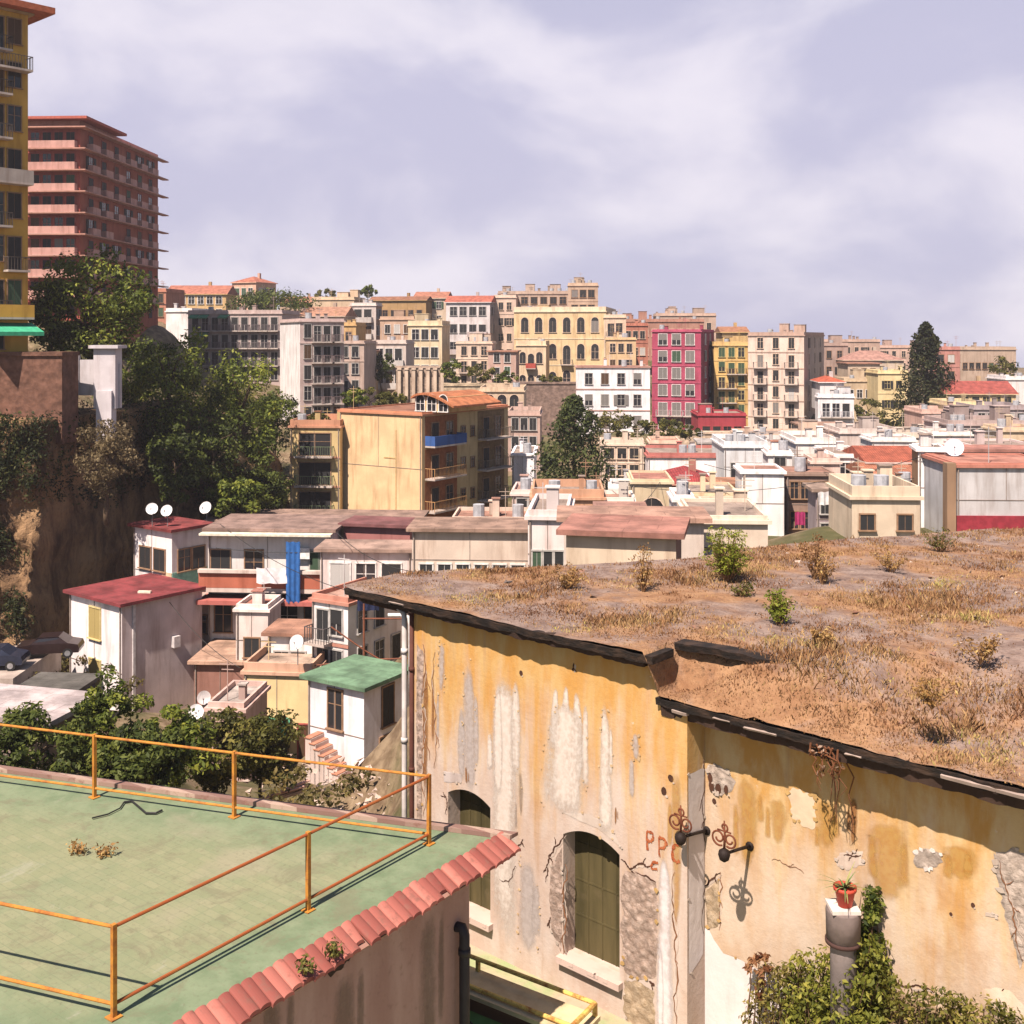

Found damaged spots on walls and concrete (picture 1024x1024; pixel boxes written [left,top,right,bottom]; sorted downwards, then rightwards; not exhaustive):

damp [437,639,446,735]
crack [543,834,568,953]
flaking render [620,871,659,1024]
crack [621,858,723,1024]
crack [698,760,706,843]
flaking render [705,763,736,796]
peeling [785,788,818,830]
peeling [834,850,865,871]
rust [847,800,857,843]
damp [869,827,907,895]
peeling [913,847,943,872]
flaking render [974,847,1024,969]